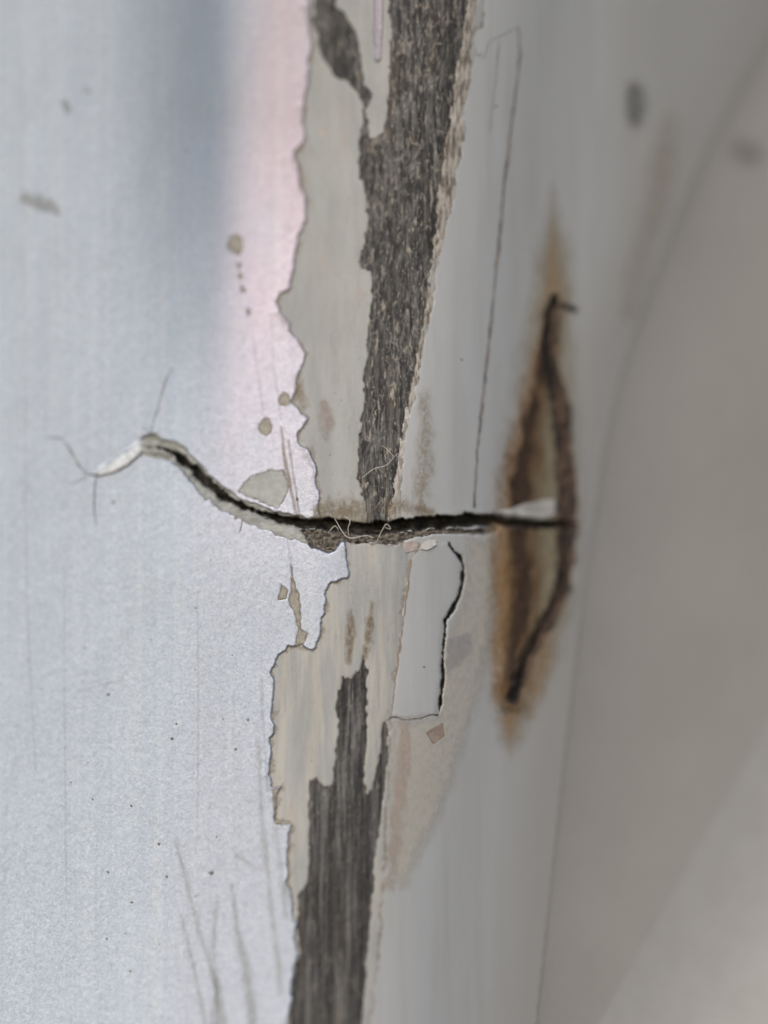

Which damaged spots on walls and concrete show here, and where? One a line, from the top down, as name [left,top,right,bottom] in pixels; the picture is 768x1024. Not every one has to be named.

crack [46,26,580,721]
peeling [276,0,392,524]
peeling [269,542,421,1024]
peeling [427,723,445,744]
peeling [388,0,485,523]
corrosion [495,245,569,729]